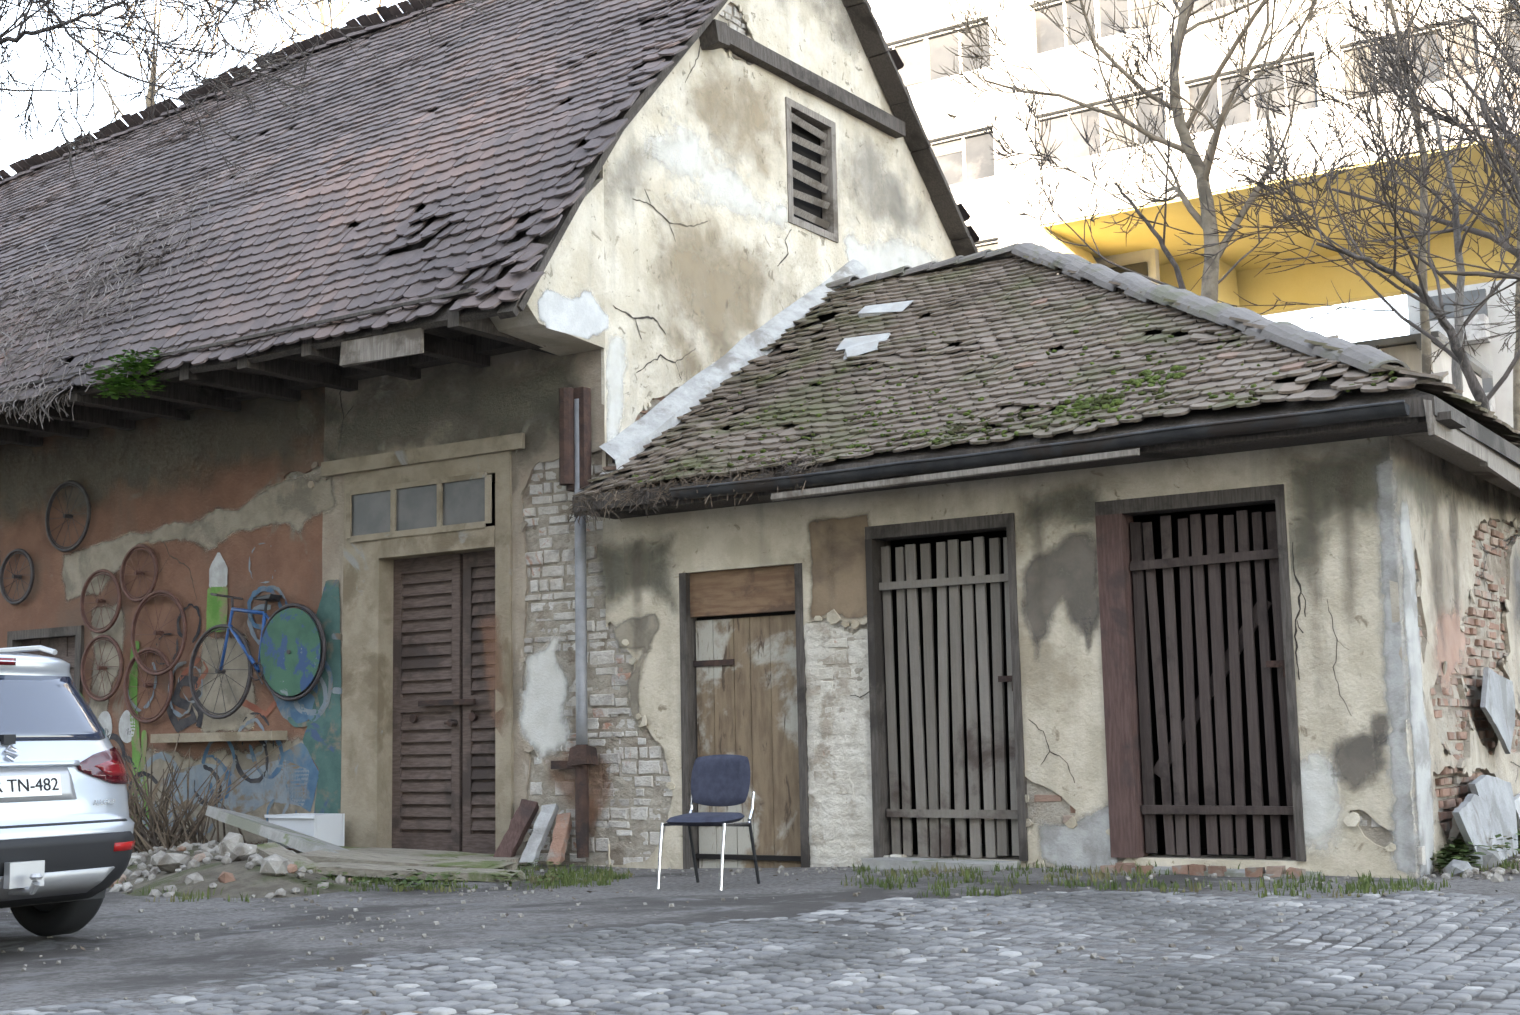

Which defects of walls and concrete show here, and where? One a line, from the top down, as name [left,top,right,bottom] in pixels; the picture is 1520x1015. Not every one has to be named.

crack [632,188,708,242]
peeling [591,337,665,479]
crack [613,305,696,380]
peeling [62,462,336,719]
water stain [1023,489,1100,650]
water stain [1290,455,1383,568]
water stain [1401,466,1520,592]
spalling [519,459,675,866]
spalling [804,609,907,867]
crack [1029,720,1075,783]
water stain [1300,714,1389,846]
spalling [1430,518,1520,839]